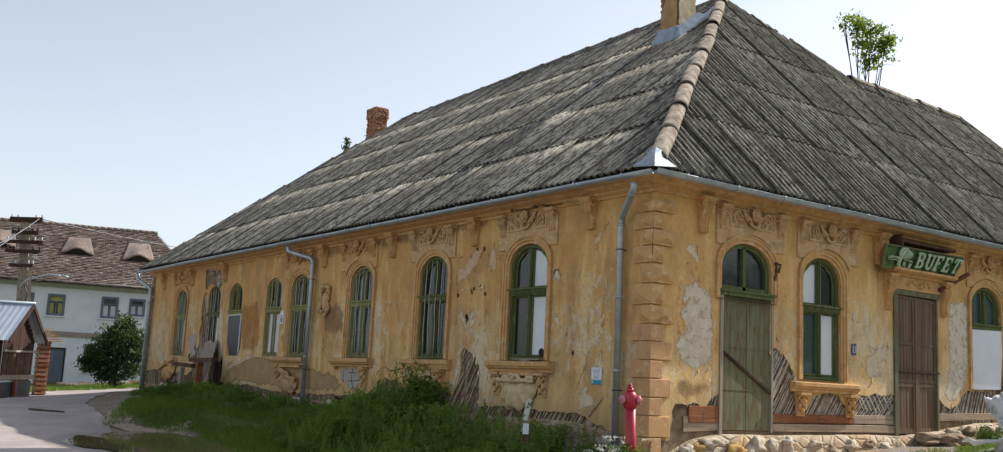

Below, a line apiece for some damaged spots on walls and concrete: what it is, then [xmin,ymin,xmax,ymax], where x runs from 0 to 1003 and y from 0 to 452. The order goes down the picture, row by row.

flaking render [209,308,223,386]
peeling [455,241,500,292]
peeling [676,244,718,373]
peeling [945,297,969,408]